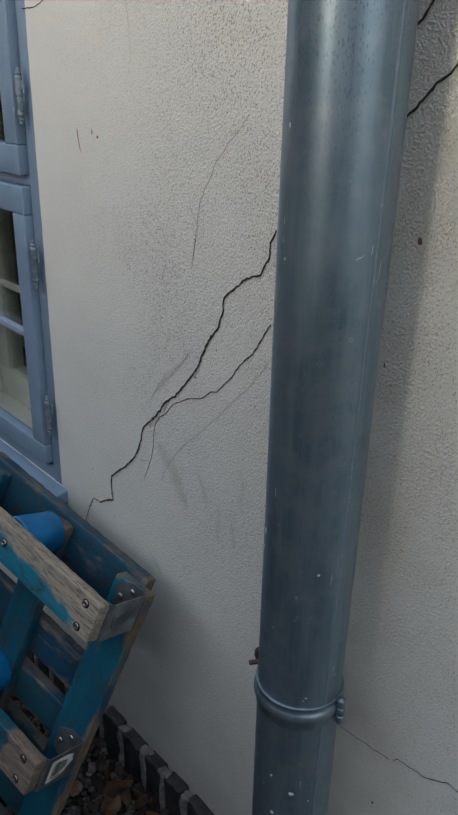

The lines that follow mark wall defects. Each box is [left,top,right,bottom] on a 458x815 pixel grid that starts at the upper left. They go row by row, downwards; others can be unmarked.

crack [417,0,435,26]
crack [407,58,458,120]
crack [86,229,277,521]
crack [338,724,458,792]